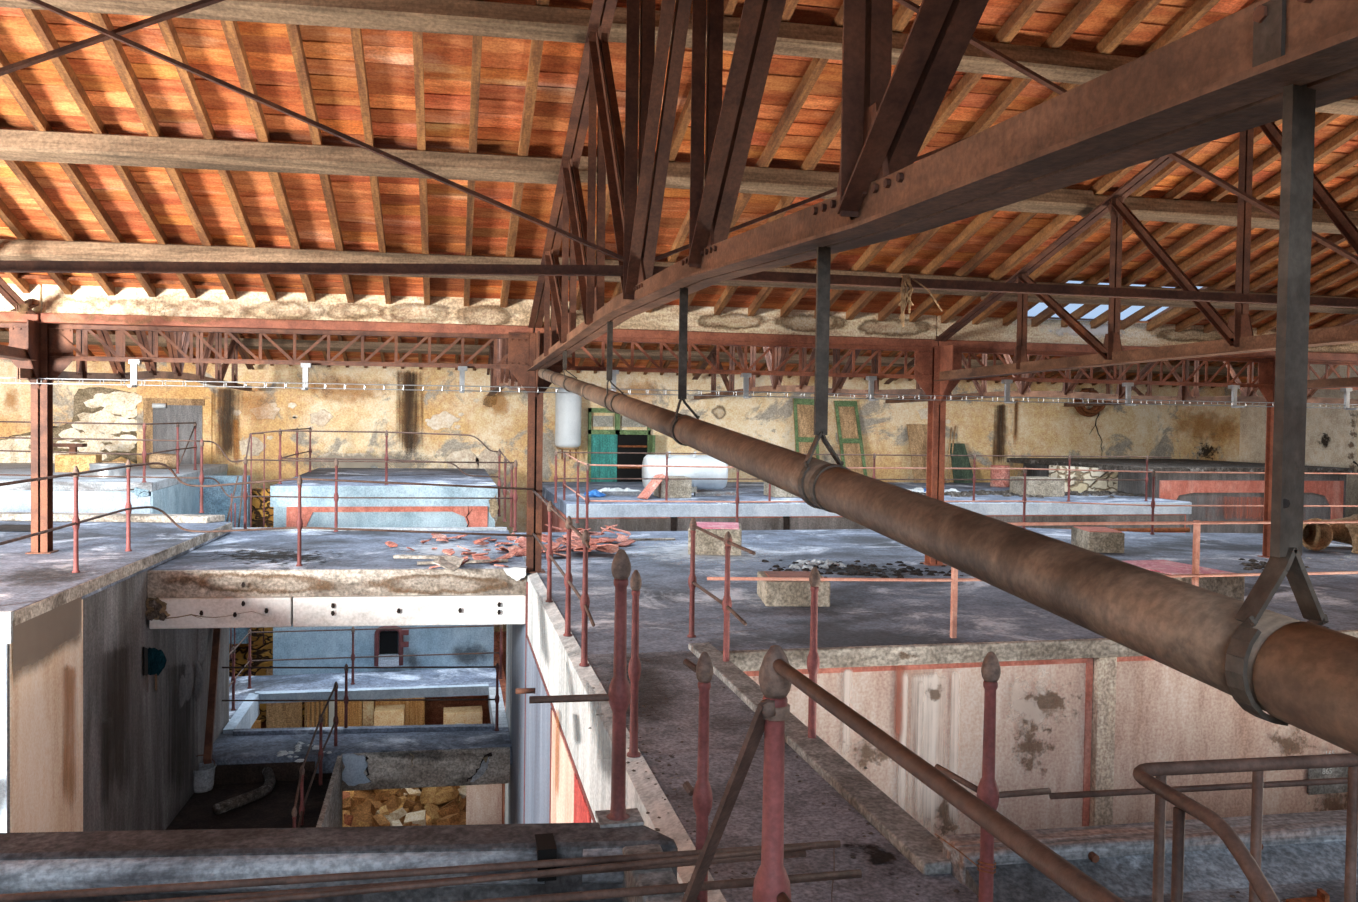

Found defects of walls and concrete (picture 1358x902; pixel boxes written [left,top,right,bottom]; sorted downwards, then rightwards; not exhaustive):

flaking render [0,432,31,463]
flaking render [53,387,143,463]
leakage [214,388,238,461]
leakage [287,371,428,468]
spalling [145,597,170,621]
leakage [1014,691,1081,772]